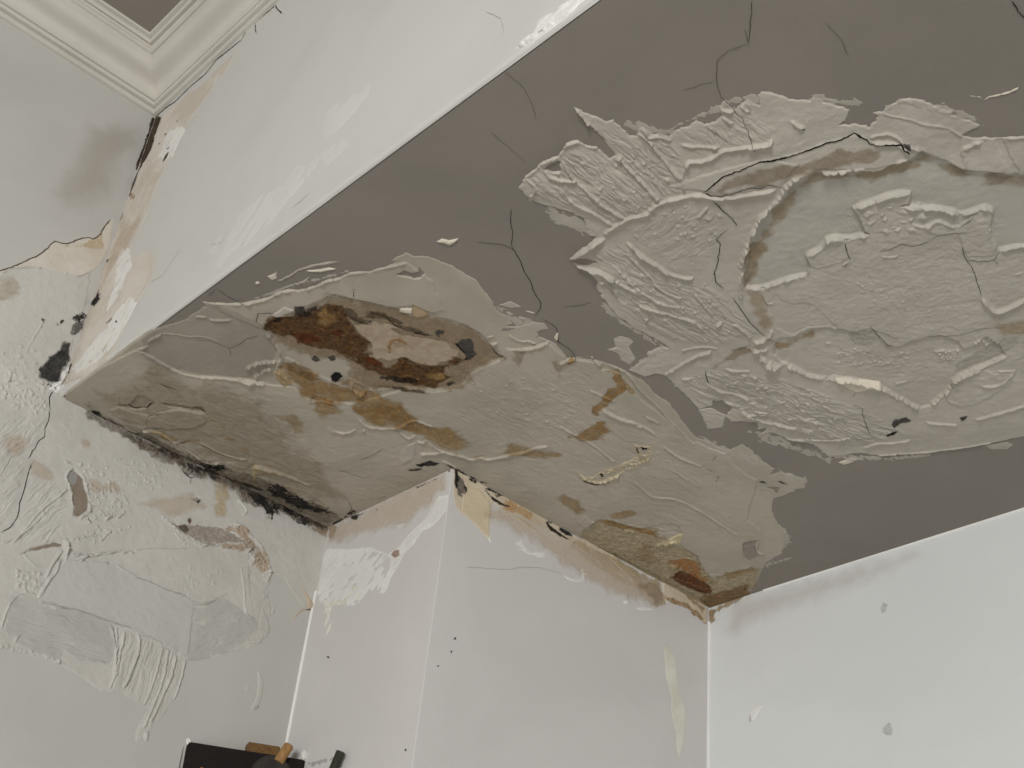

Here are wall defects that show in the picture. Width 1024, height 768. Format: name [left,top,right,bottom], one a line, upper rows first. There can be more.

crack [0,219,111,271]
peeling [0,55,234,393]
crack [478,209,588,360]
damp [746,231,768,281]
crack [686,3,910,349]
damp [721,150,929,191]
damp [264,299,502,450]
crack [4,392,53,531]
peeling [68,471,88,517]
damp [87,411,665,606]
peeling [293,470,628,635]
peeling [663,583,707,624]